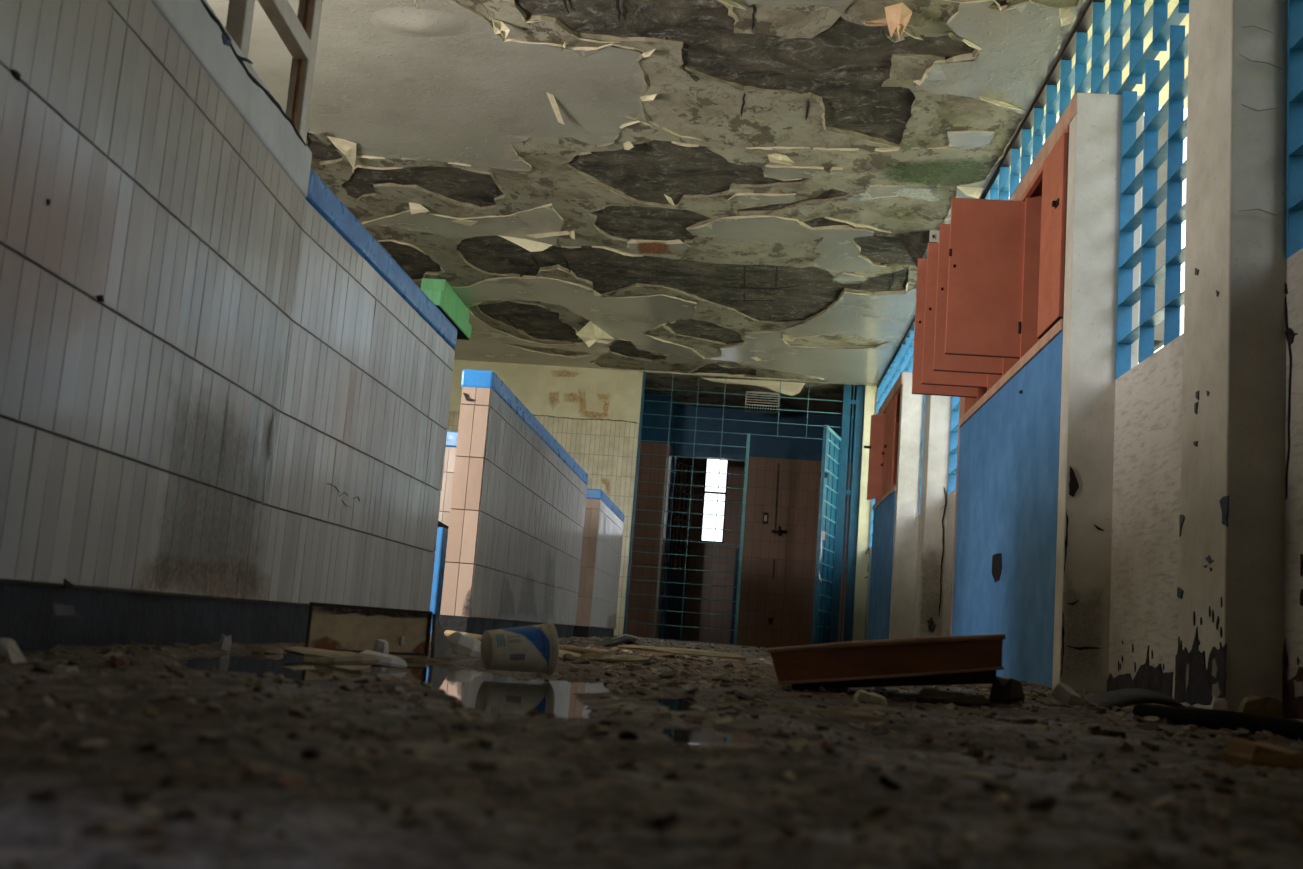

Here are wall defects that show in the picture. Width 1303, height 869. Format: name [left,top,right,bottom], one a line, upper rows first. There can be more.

crack [200,0,306,146]
peeling [306,0,1079,396]
crack [1285,297,1298,499]
peeling [1107,597,1227,705]
peeling [1282,638,1303,719]